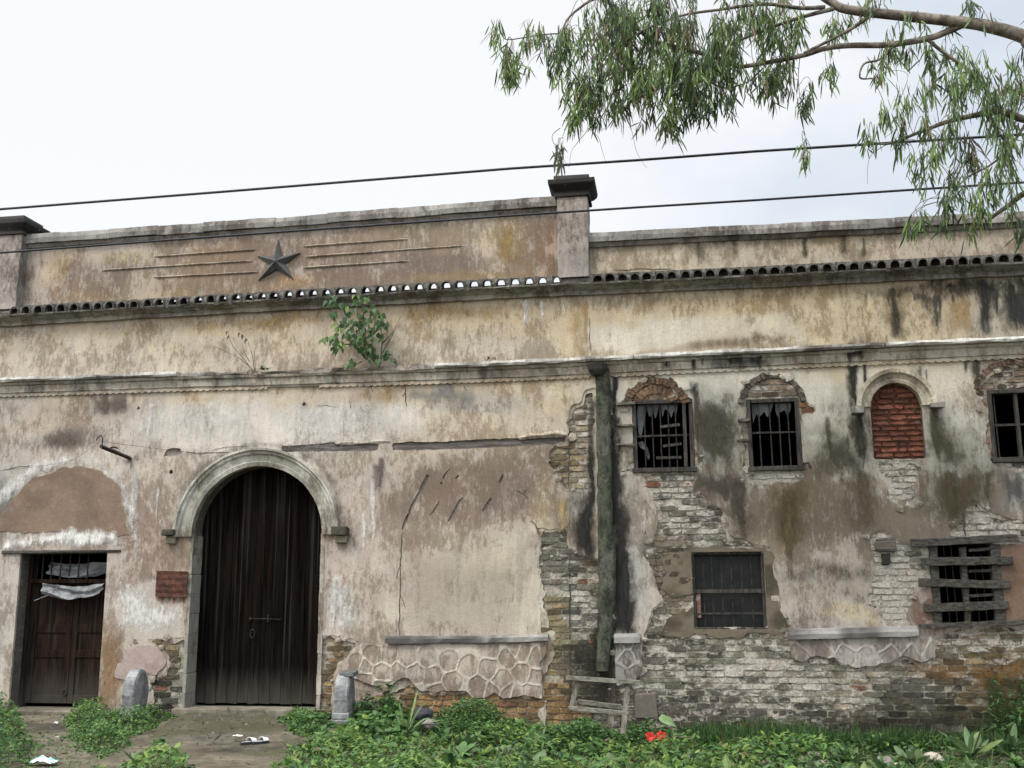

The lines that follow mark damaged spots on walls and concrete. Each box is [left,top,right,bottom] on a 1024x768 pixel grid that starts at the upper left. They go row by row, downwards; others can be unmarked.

leakage [887,277,1024,337]
spalling [548,388,598,492]
spalling [620,376,690,423]
leakage [690,382,734,462]
leakage [826,349,874,524]
crack [397,531,405,635]
leakage [572,377,635,710]
spalling [375,414,1024,739]
leakage [696,474,745,537]
leakage [773,488,808,569]
spalling [132,634,187,715]
spalling [319,635,359,713]